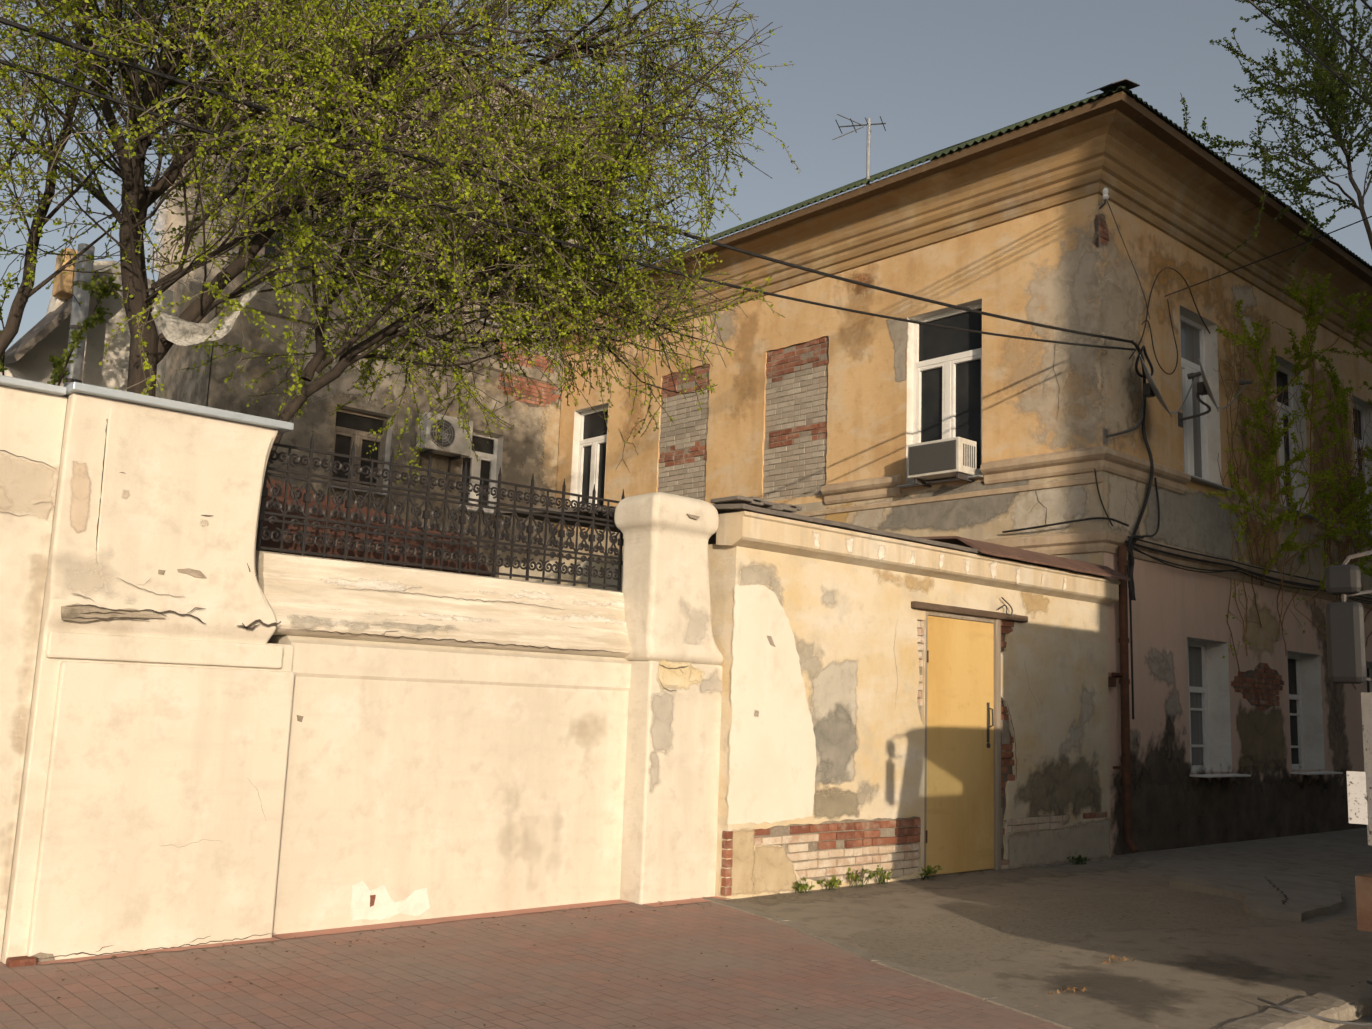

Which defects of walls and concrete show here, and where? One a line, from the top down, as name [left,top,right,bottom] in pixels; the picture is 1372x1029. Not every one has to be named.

flaking render [496,342,561,487]
crack [0,501,54,521]
crack [96,419,126,552]
crack [119,578,615,653]
peeling [650,584,921,896]
flaking render [1001,700,1107,866]
flaking render [1231,663,1286,774]
peeling [351,881,430,921]